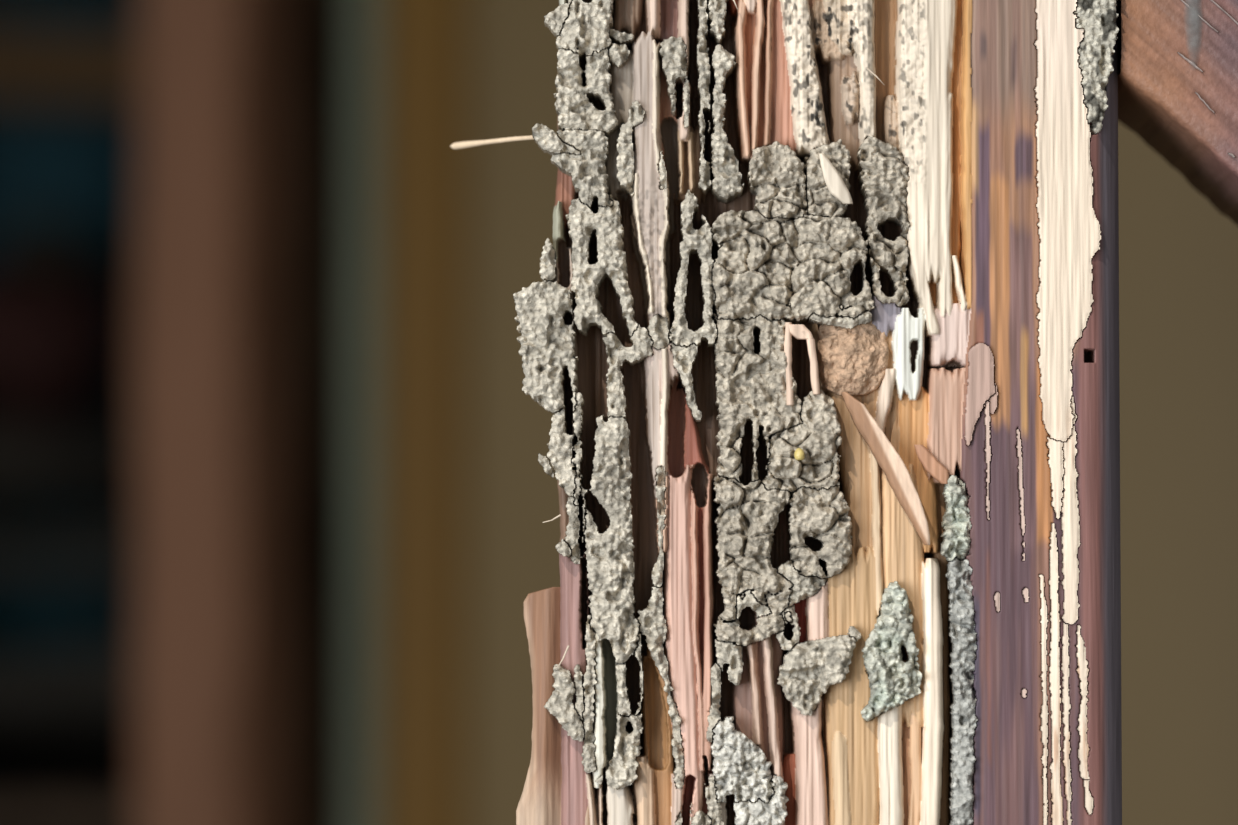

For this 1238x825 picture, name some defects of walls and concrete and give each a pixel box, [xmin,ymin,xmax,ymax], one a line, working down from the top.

peeling [964,343,998,446]
peeling [1034,0,1101,825]